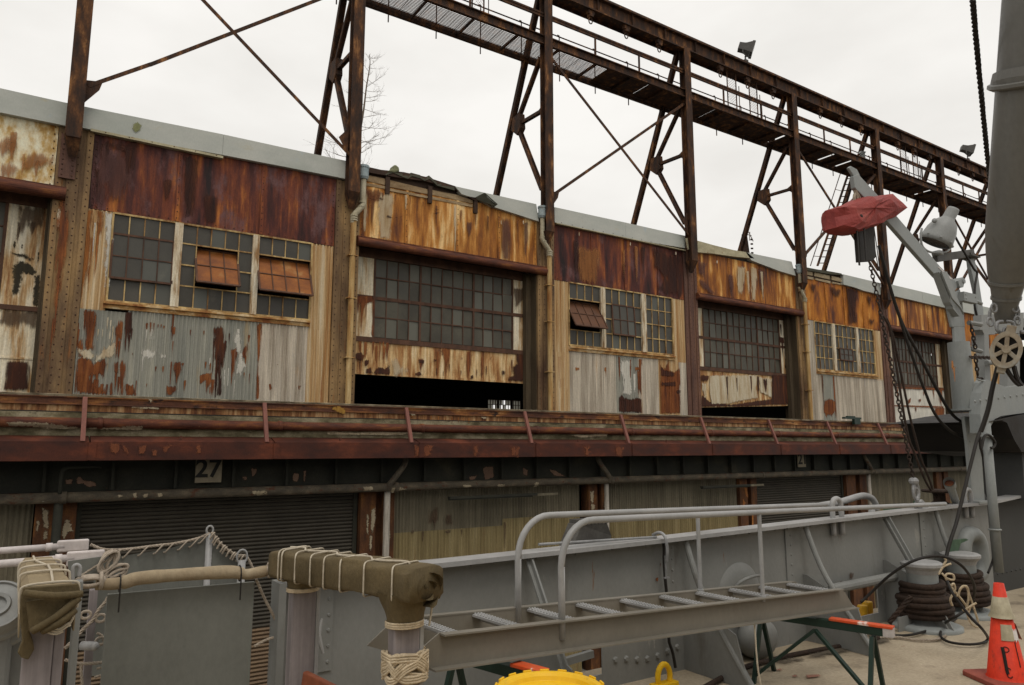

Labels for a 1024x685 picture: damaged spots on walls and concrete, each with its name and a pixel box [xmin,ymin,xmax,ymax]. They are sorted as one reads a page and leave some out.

corrosion [0,132,53,177]
corrosion [185,157,217,222]
corrosion [366,189,396,223]
corrosion [460,210,528,260]
corrosion [573,241,600,284]
corrosion [623,246,683,297]
corrosion [832,288,874,324]
corrosion [0,309,903,431]
peeling [620,360,636,395]
peeling [702,375,772,404]